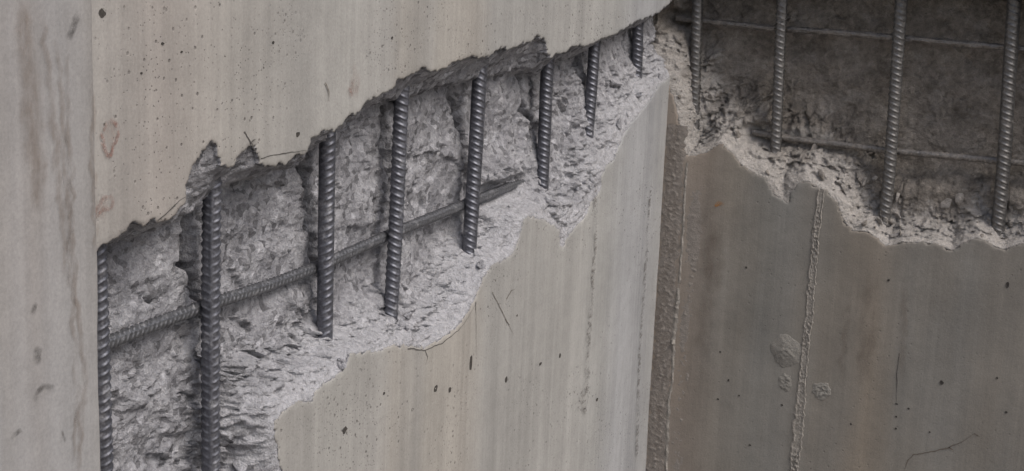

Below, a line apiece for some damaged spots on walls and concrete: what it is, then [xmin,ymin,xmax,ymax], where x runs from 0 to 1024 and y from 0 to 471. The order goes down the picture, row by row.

spalling [97,17,669,471]
spalling [650,0,1024,251]